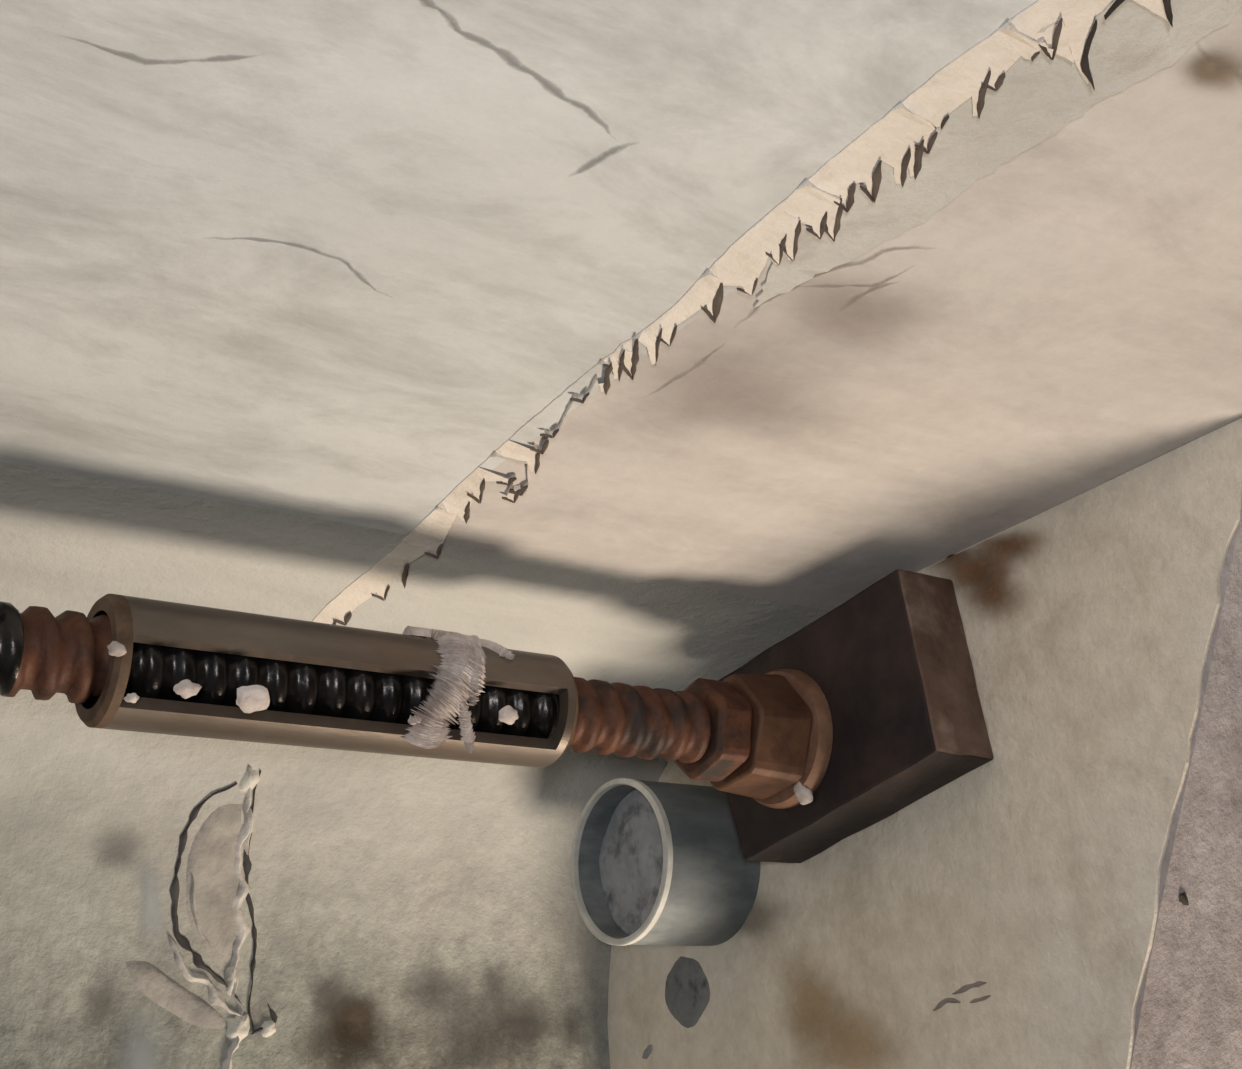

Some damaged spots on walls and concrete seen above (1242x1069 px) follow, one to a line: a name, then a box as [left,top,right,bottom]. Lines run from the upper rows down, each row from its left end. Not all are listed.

crack [312,0,1242,626]
corrosion [940,536,1032,607]
crack [123,767,277,1069]
water stain [319,1003,375,1068]